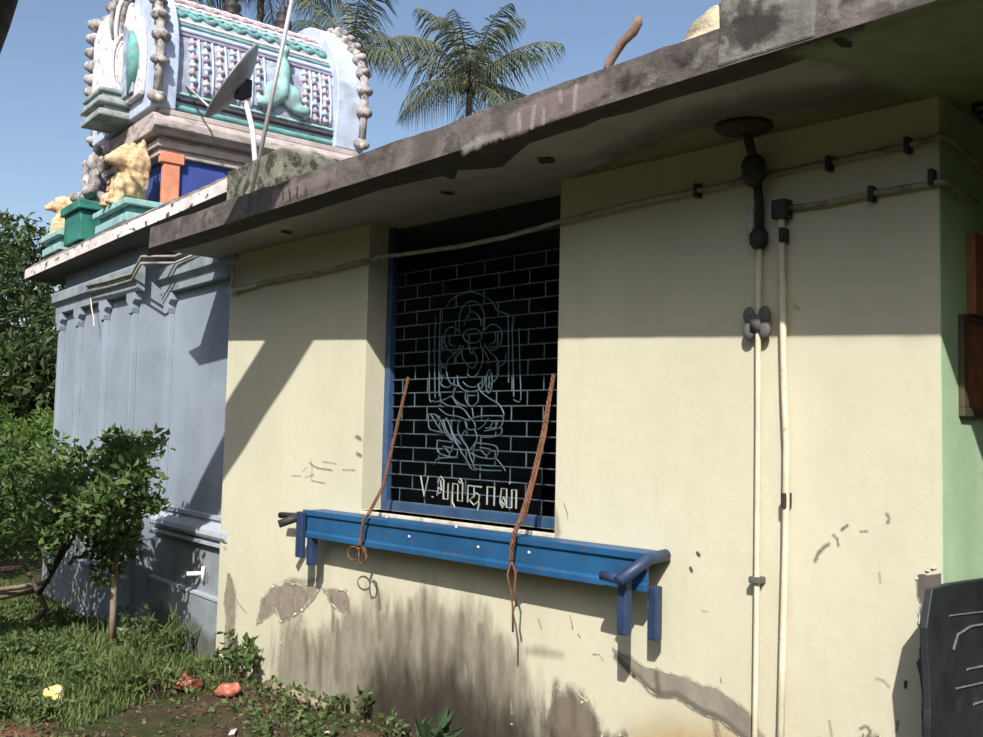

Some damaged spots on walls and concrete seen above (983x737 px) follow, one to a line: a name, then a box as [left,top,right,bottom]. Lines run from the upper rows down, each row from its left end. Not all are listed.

peeling [223,573,244,649]
peeling [257,582,351,625]
leakage [278,602,627,737]
spalling [916,565,941,737]